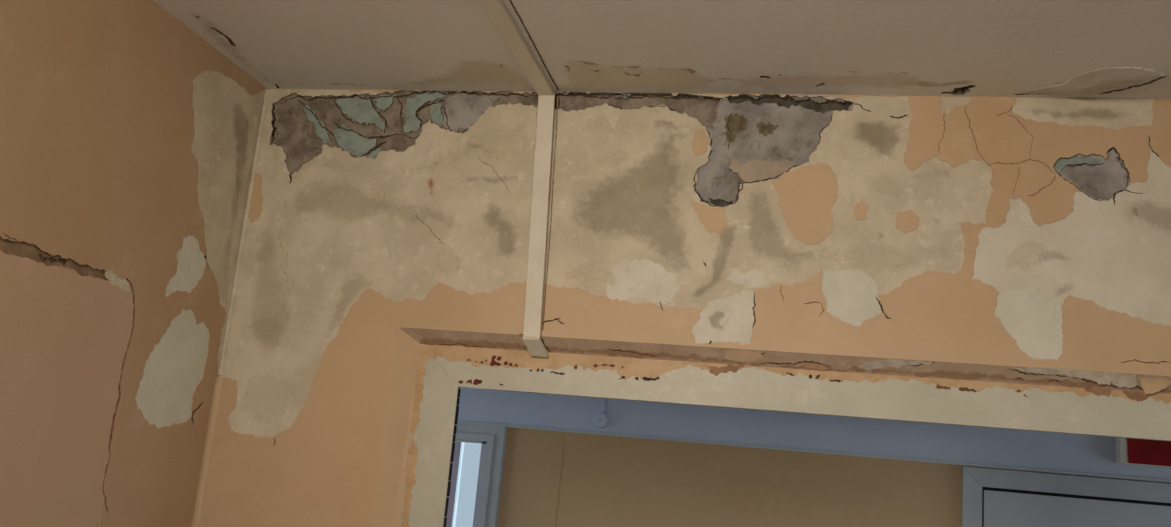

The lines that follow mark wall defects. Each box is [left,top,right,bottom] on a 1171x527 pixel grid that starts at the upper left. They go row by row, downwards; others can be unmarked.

crack [0,234,135,527]
peeling [135,70,538,438]
peeling [467,355,578,375]
peeling [544,92,1171,394]
crack [938,94,1055,196]